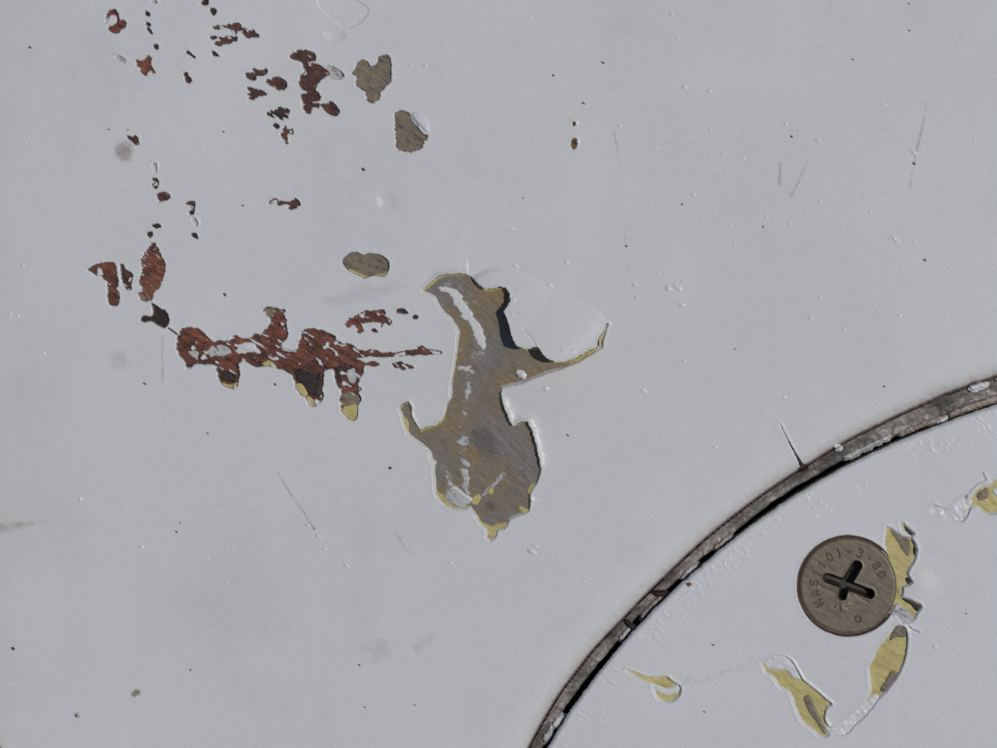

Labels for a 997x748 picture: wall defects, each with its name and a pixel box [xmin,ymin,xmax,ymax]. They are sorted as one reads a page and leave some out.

peeling [107,10,126,33]
peeling [136,12,159,75]
peeling [210,23,259,56]
peeling [246,69,287,99]
peeling [291,50,392,116]
peeling [267,107,293,143]
peeling [396,111,430,152]
peeling [89,224,436,420]
peeling [400,265,608,539]
peeling [931,472,997,521]
peeling [763,524,920,735]
peeling [628,670,680,700]